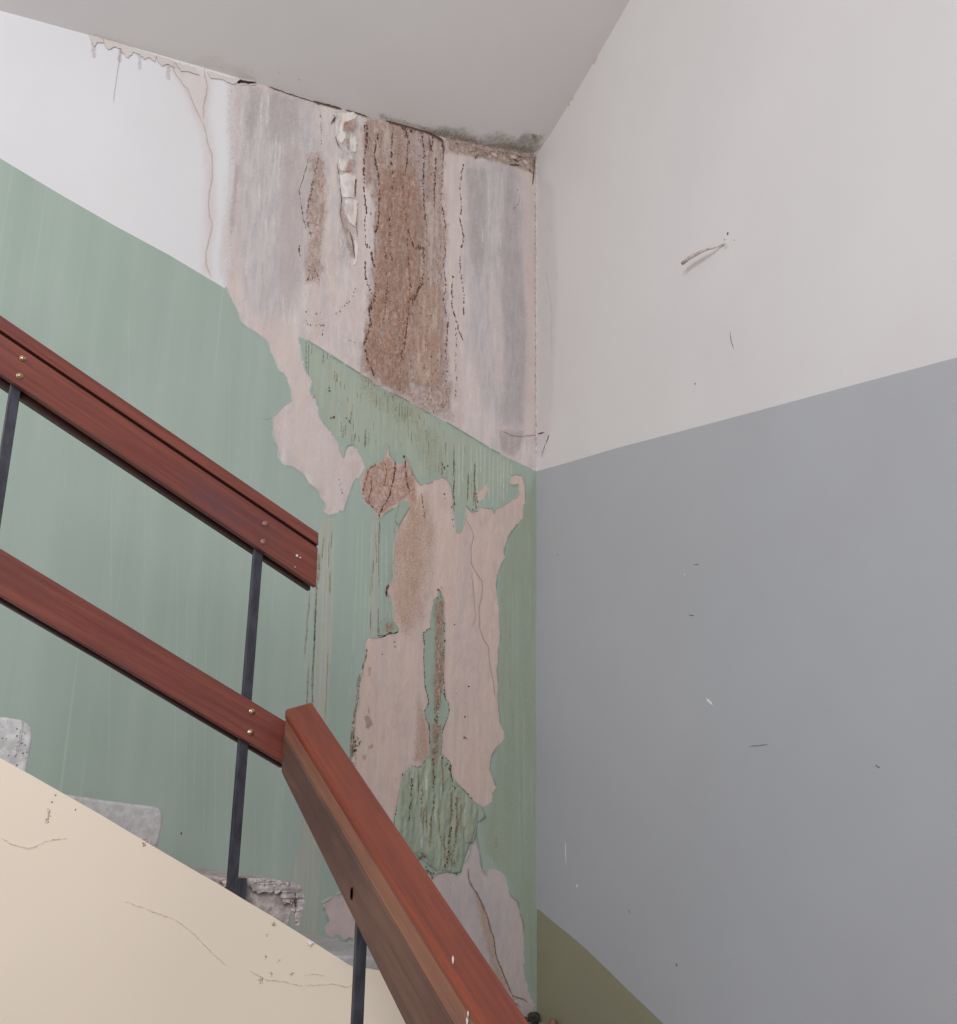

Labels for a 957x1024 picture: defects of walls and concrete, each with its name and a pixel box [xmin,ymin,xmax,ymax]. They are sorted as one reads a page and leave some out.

crack [168,60,220,279]
leakage [191,53,327,338]
leakage [303,113,559,519]
peeling [90,34,537,822]
spalling [249,875,305,925]
peeling [320,891,355,943]
peeling [414,824,536,1018]